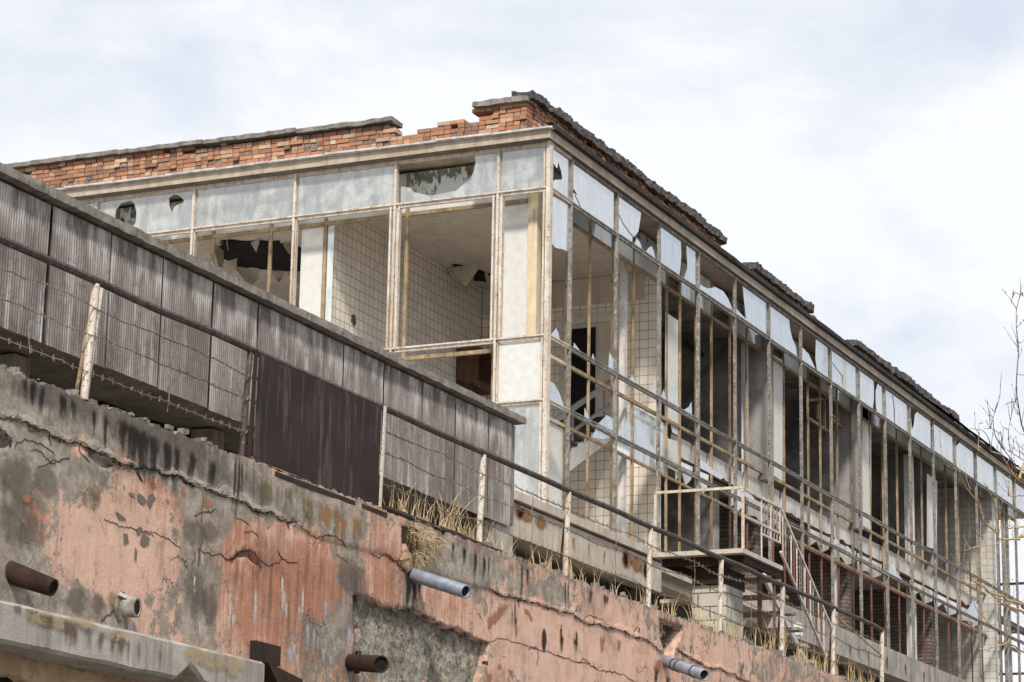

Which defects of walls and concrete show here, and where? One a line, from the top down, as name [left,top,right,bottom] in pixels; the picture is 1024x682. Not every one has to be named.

water stain [23,380,38,402]
water stain [93,411,196,486]
crack [0,410,347,567]
rust [247,349,387,538]
rust [514,505,546,529]
rust [623,549,647,579]
spalling [351,595,514,682]
crack [484,584,750,682]